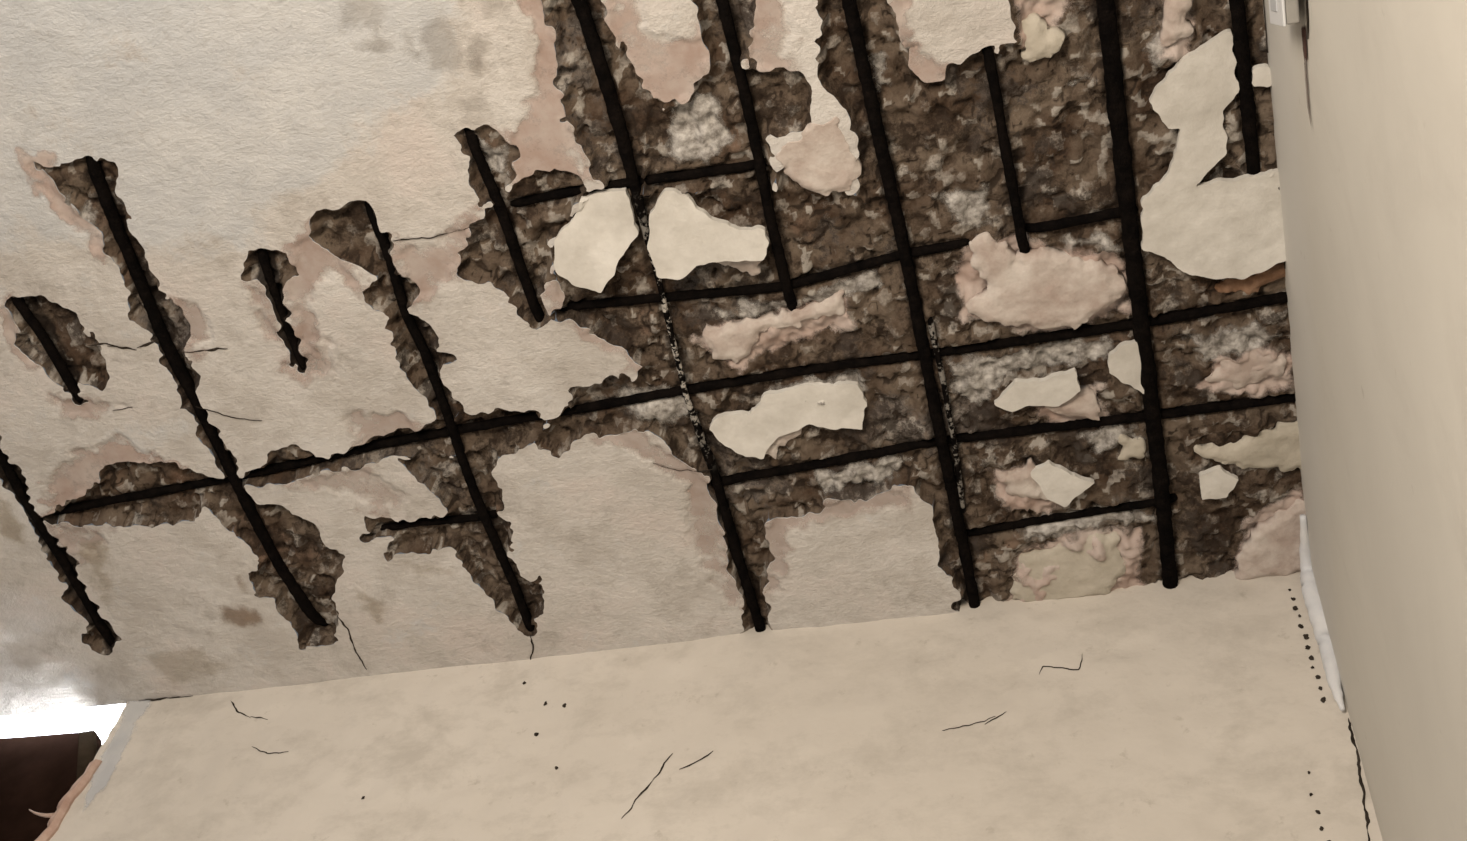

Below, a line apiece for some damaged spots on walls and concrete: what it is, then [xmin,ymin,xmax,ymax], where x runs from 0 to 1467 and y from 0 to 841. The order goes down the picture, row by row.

spalling [0,0,1306,655]